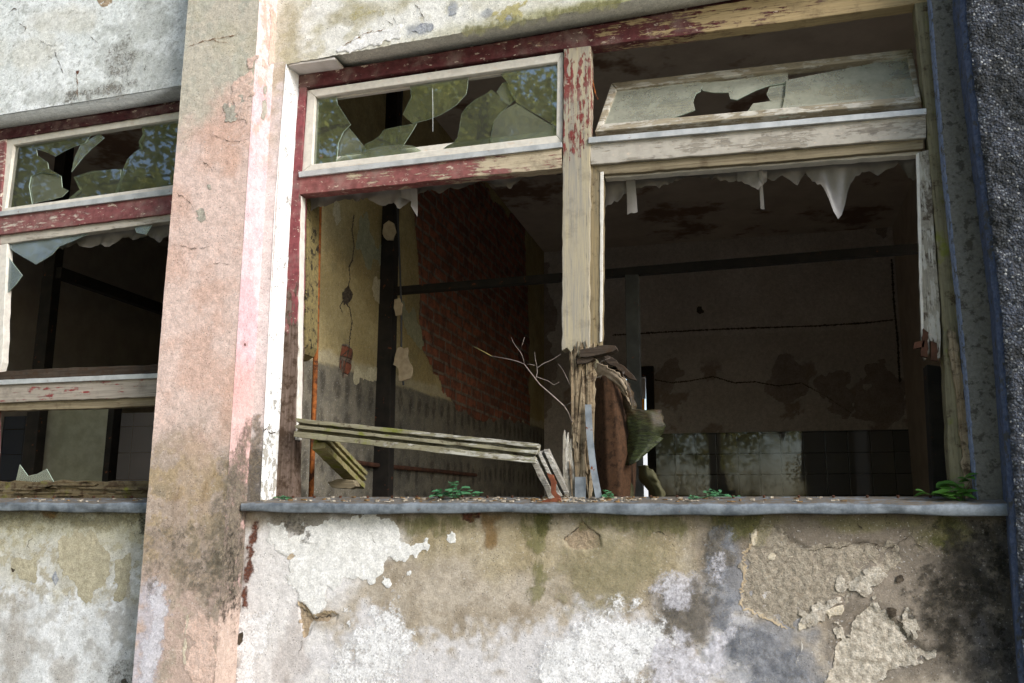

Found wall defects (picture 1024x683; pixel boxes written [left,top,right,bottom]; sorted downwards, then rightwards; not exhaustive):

crack [339,216,355,376]
flaking render [414,182,530,426]
crack [655,376,852,414]
leakage [139,414,272,683]
peeling [266,514,430,638]
spalling [738,527,937,683]
leakage [902,520,1014,668]